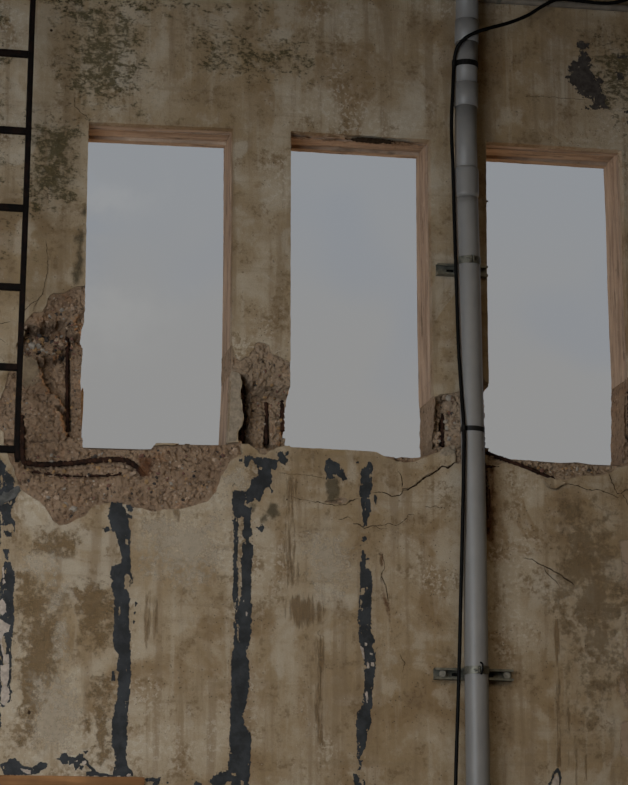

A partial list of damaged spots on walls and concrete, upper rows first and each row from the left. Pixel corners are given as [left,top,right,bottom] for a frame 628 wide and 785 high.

damp [565,35,628,124]
damp [0,460,60,747]
damp [66,502,157,777]
spalling [0,286,290,526]
damp [194,451,289,785]
damp [353,536,376,785]
damp [356,461,377,526]
crack [291,463,454,529]
spalling [385,391,461,464]
crack [524,558,574,587]
spalling [485,378,628,537]
crack [570,475,628,504]